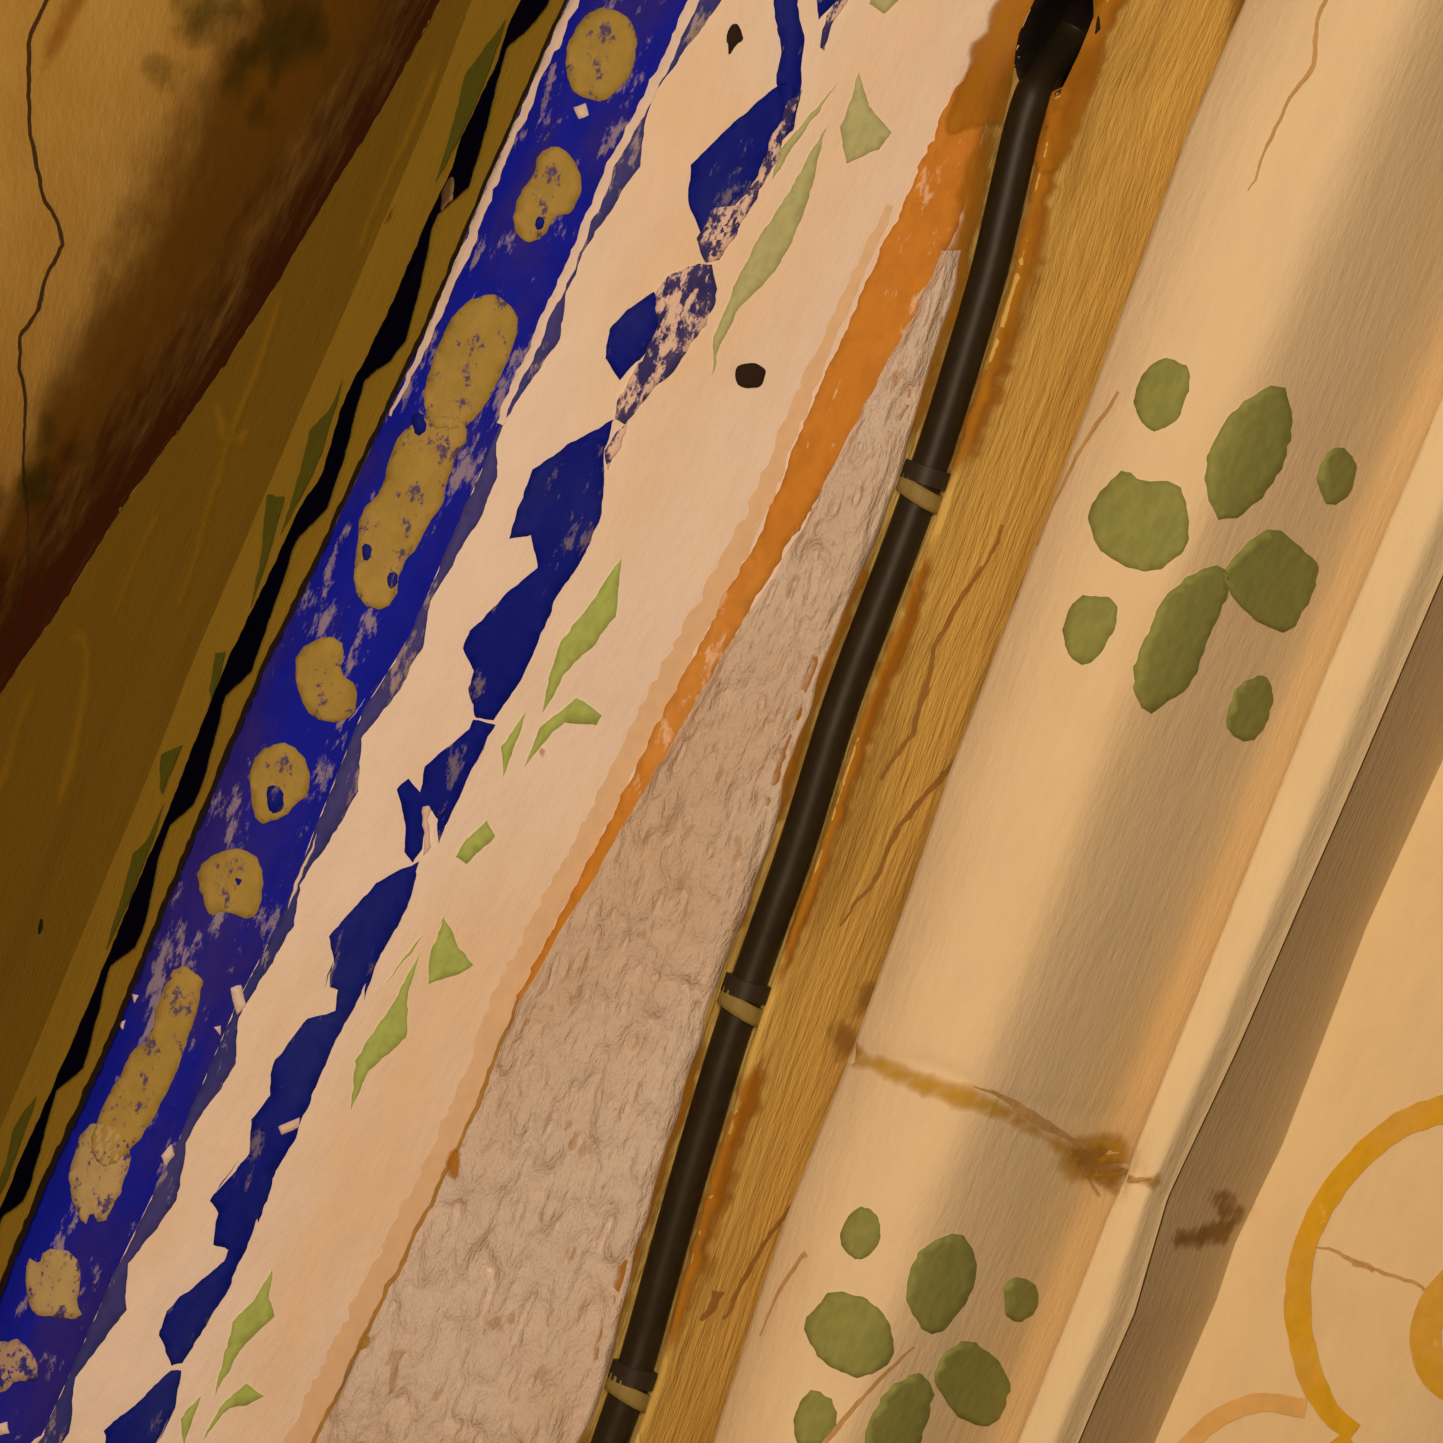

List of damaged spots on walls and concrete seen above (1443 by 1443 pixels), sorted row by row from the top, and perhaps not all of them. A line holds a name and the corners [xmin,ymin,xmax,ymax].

crack [12,0,64,620]
crack [973,1086,1151,1196]